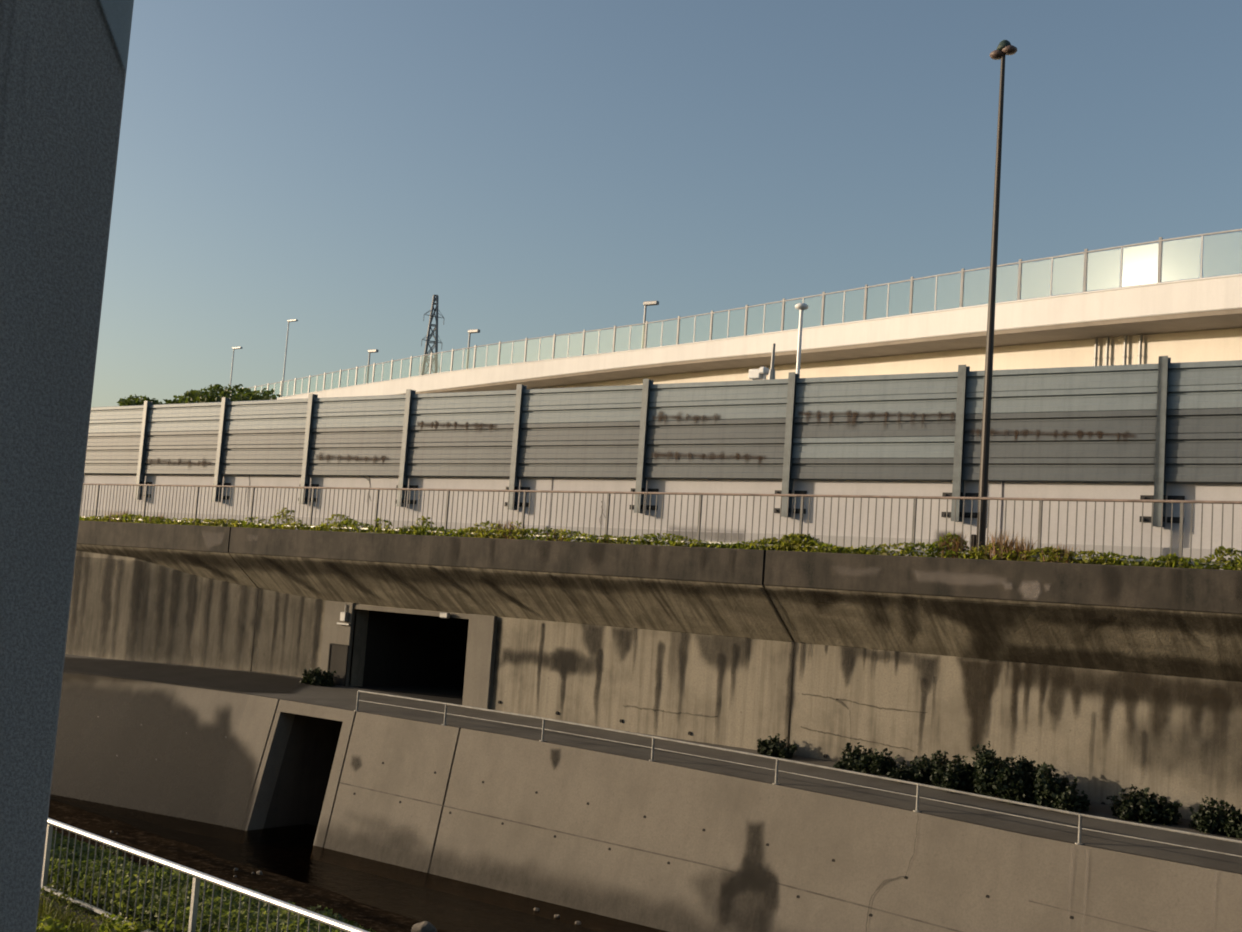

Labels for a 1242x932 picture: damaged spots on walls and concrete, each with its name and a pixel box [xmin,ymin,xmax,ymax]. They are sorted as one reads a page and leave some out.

leakage [71,549,1242,751]
leakage [721,825,777,930]